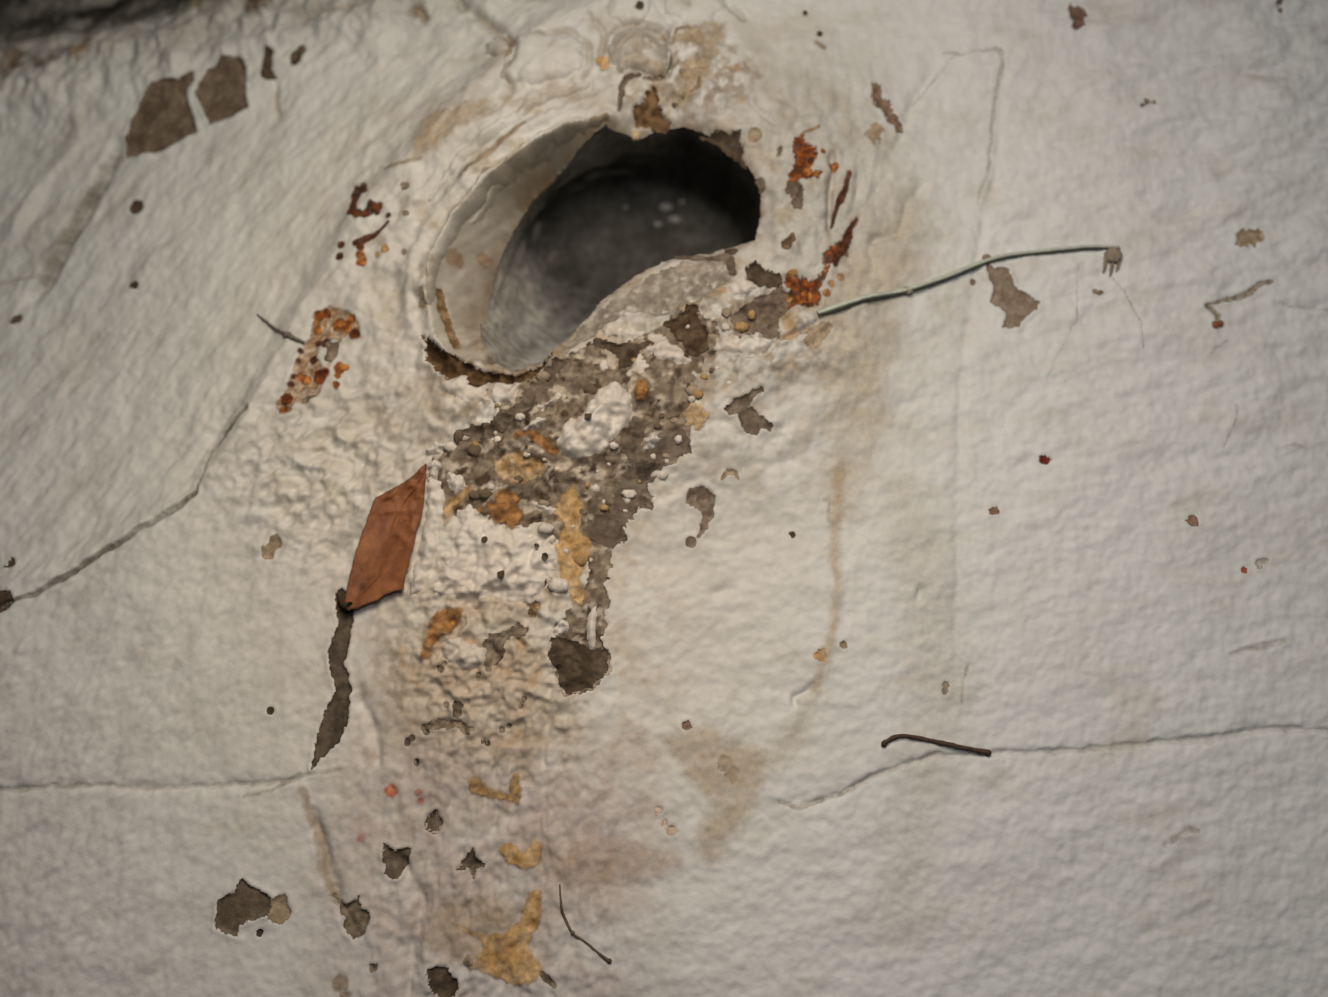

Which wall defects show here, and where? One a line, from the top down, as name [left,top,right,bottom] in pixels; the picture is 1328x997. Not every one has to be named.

peeling [124,45,277,158]
corrosion [336,182,409,266]
corrosion [780,125,858,314]
corrosion [276,306,360,414]
crack [0,409,246,613]
damp [478,428,559,529]
spalling [418,248,793,696]
peeling [311,588,354,770]
damp [420,607,463,658]
crack [779,789,850,809]
peeling [214,879,292,937]
damp [429,889,557,988]